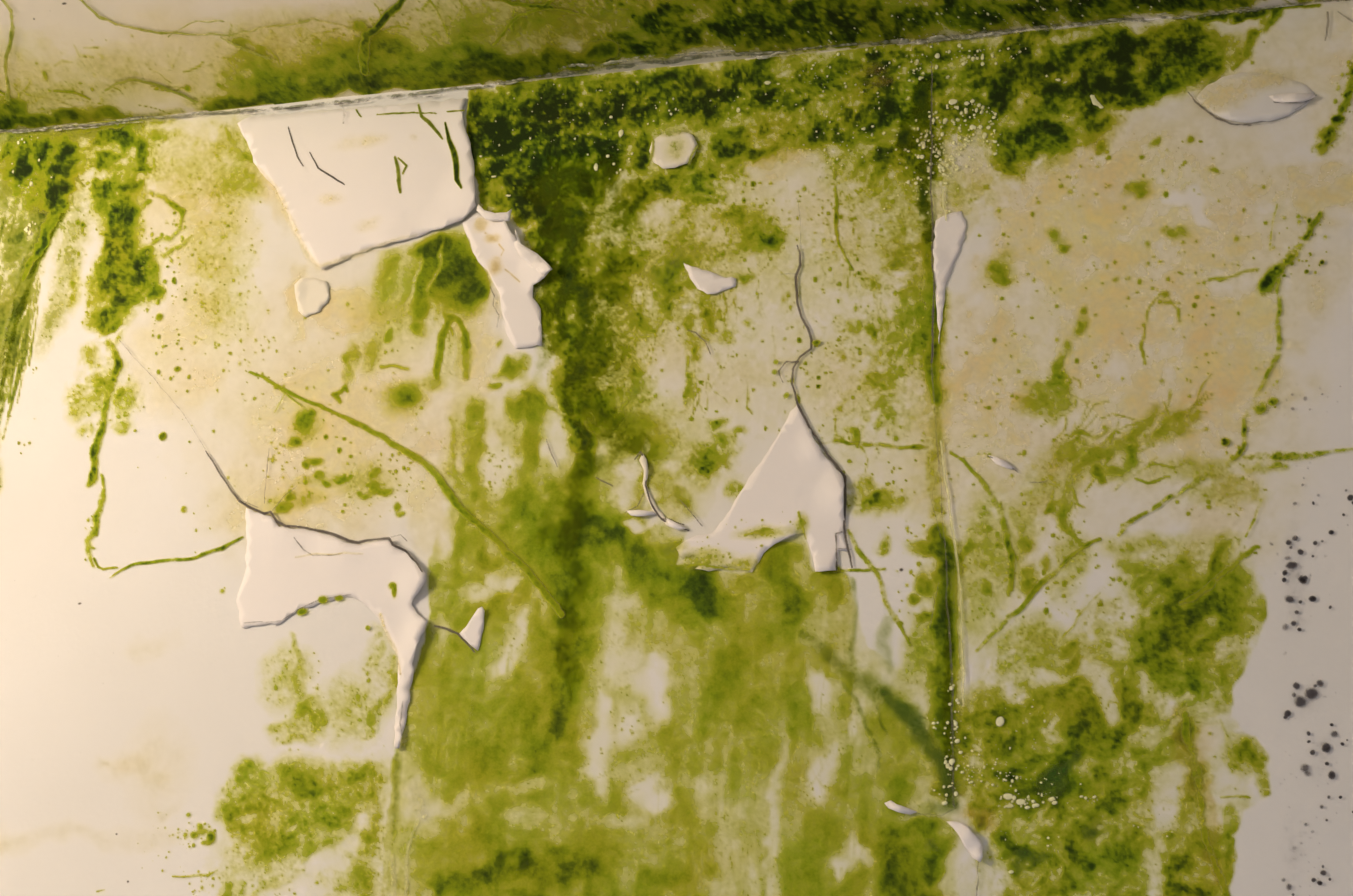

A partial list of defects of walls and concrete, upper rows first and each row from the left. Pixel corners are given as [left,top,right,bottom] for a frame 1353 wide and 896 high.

leakage [0,63,243,576]
crack [205,450,423,572]
peeling [236,508,428,749]
leakage [264,232,490,517]
peeling [237,98,552,348]
peeling [649,129,698,169]
crack [0,0,1351,383]
peeling [627,404,847,572]
crack [772,245,853,570]
crack [935,440,965,727]
leakage [775,452,1269,896]
leakage [177,760,393,896]